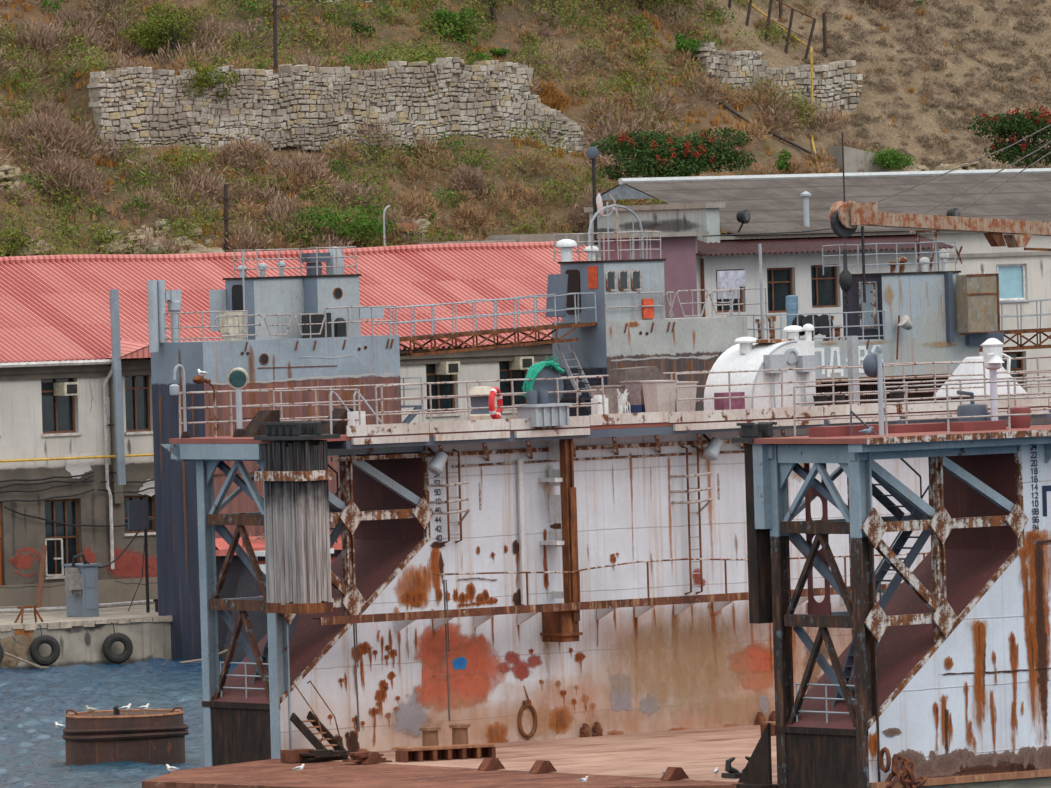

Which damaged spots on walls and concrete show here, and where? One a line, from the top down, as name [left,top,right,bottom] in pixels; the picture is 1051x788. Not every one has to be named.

corrosion [249,347,260,417]
corrosion [395,541,498,645]
corrosion [476,540,525,606]
corrosion [328,627,417,752]
corrosion [486,723,508,743]
corrosion [539,680,596,733]
corrosion [559,642,586,669]
corrosion [622,607,659,660]
corrosion [792,627,809,689]
corrosion [933,695,953,754]
corrosion [964,621,997,752]
corrosion [1008,530,1051,755]